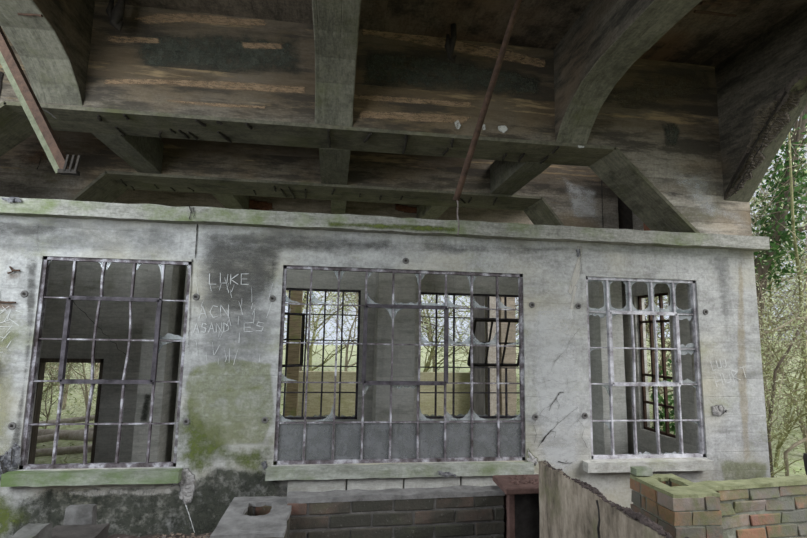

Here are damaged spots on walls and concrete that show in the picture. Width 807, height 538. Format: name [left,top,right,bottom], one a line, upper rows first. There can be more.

spalling [725,87,807,200]
water stain [211,236,329,309]
crack [533,328,588,448]
crack [0,447,13,480]